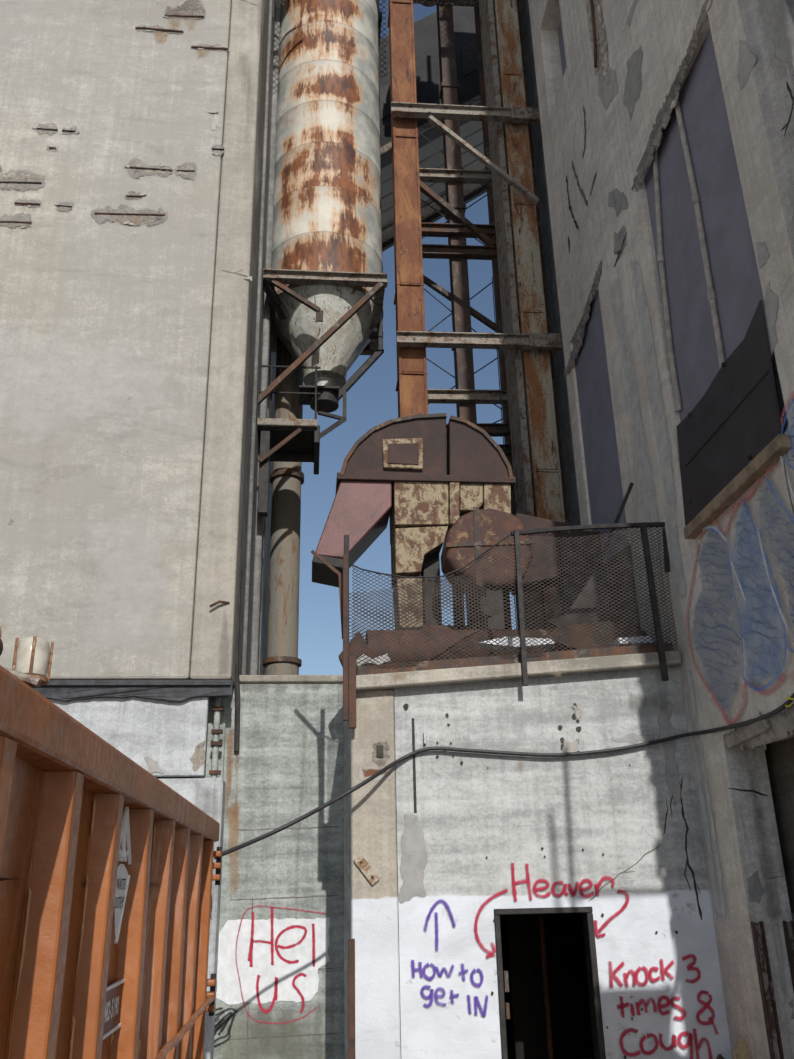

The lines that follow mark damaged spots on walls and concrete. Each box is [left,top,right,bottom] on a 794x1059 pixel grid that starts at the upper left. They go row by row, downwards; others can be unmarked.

spalling [135,0,205,34]
spalling [32,123,79,152]
spalling [0,167,45,229]
spalling [55,201,73,212]
spalling [91,157,196,227]
crack [728,788,768,798]
crack [588,778,702,920]